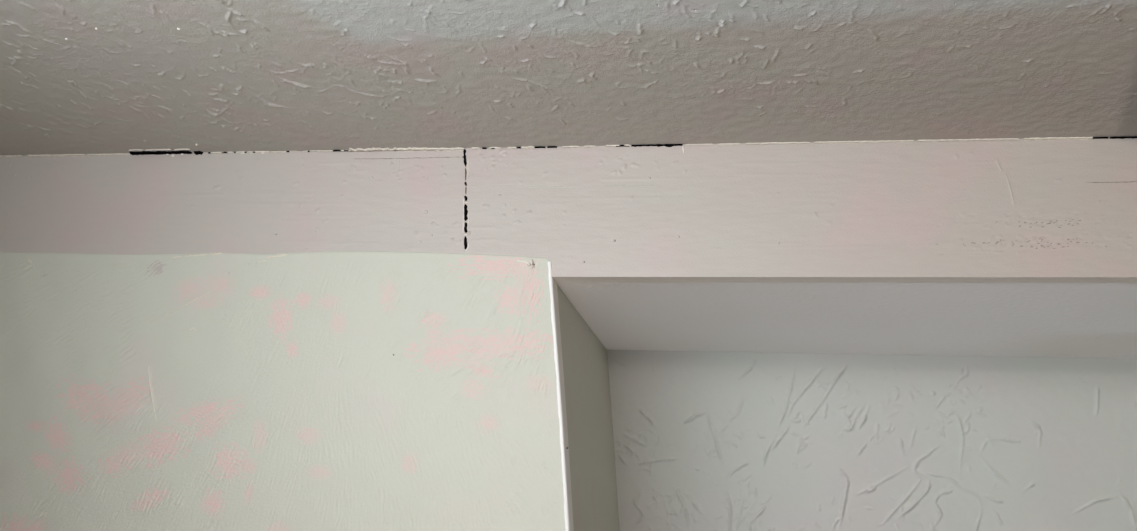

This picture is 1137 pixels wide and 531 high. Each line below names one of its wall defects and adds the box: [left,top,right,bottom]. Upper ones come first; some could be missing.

crack [1092,133,1137,141]
crack [616,141,683,149]
crack [463,146,557,252]